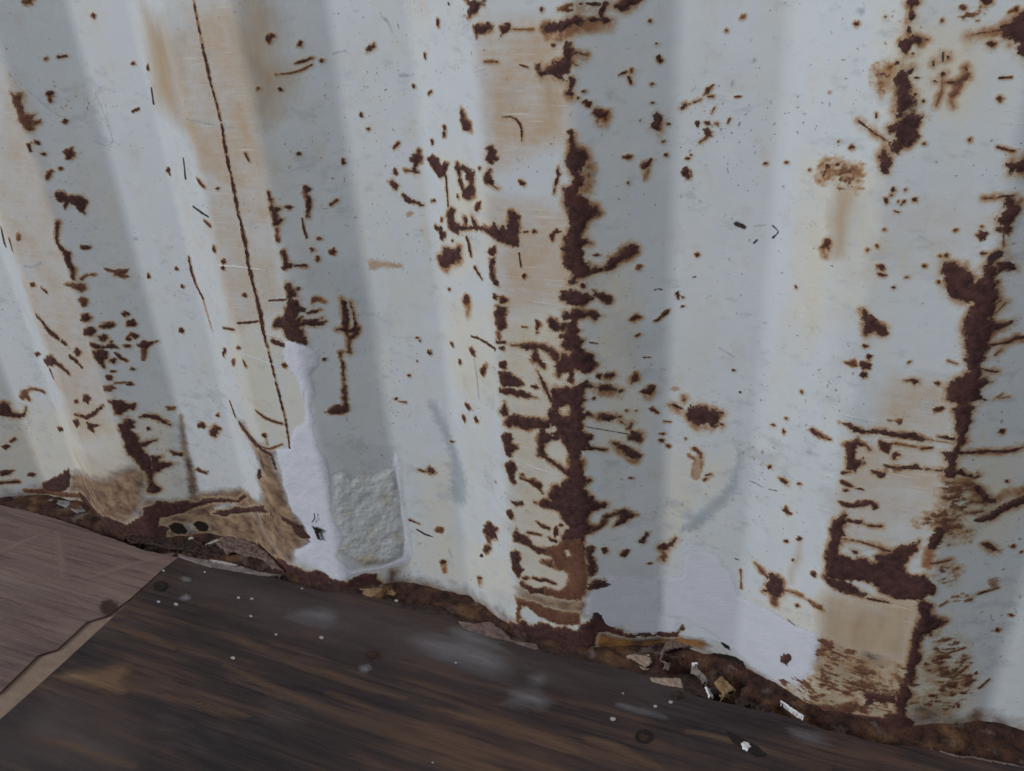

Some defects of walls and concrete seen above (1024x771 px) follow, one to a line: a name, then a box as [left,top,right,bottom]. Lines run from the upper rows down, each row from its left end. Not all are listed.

corrosion [9,91,47,156]
corrosion [459,107,473,134]
corrosion [463,0,643,128]
corrosion [807,0,973,260]
corrosion [959,0,994,11]
corrosion [963,5,1024,59]
corrosion [1004,154,1024,177]
corrosion [0,146,411,588]
corrosion [387,124,726,649]
corrosion [777,192,1024,728]